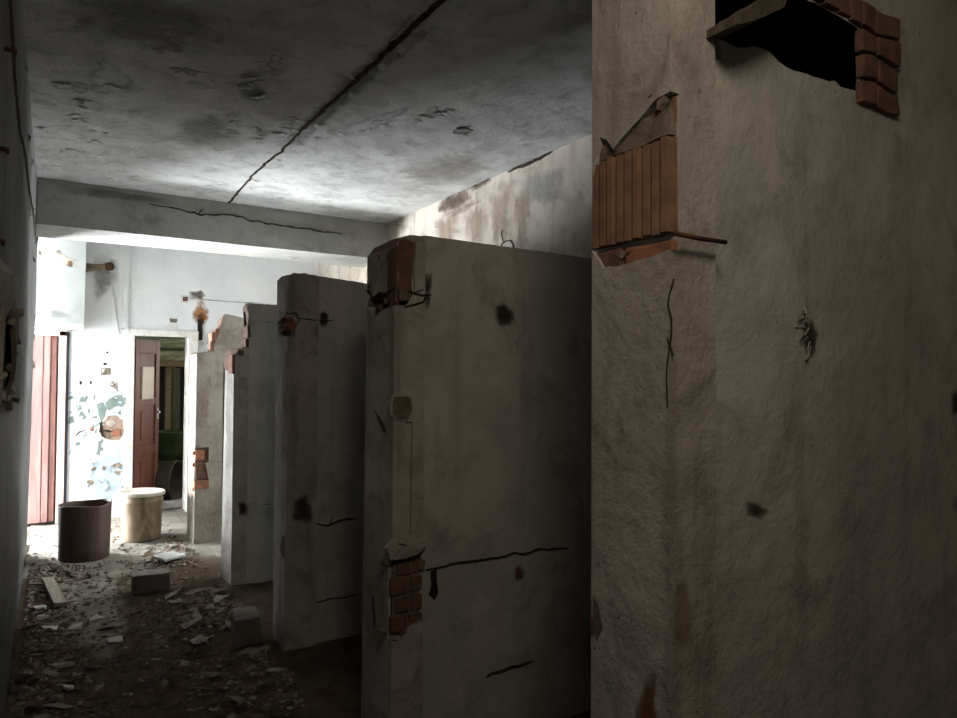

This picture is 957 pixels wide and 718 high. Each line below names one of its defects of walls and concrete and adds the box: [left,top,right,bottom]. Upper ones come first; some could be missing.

crack [148,0,446,235]
leakage [438,180,487,240]
leakage [493,173,553,237]
spalling [591,94,678,267]
spalling [0,258,36,412]
flaking render [208,329,220,351]
flaking render [228,326,251,374]
peeling [68,380,126,501]
spalling [191,449,209,498]